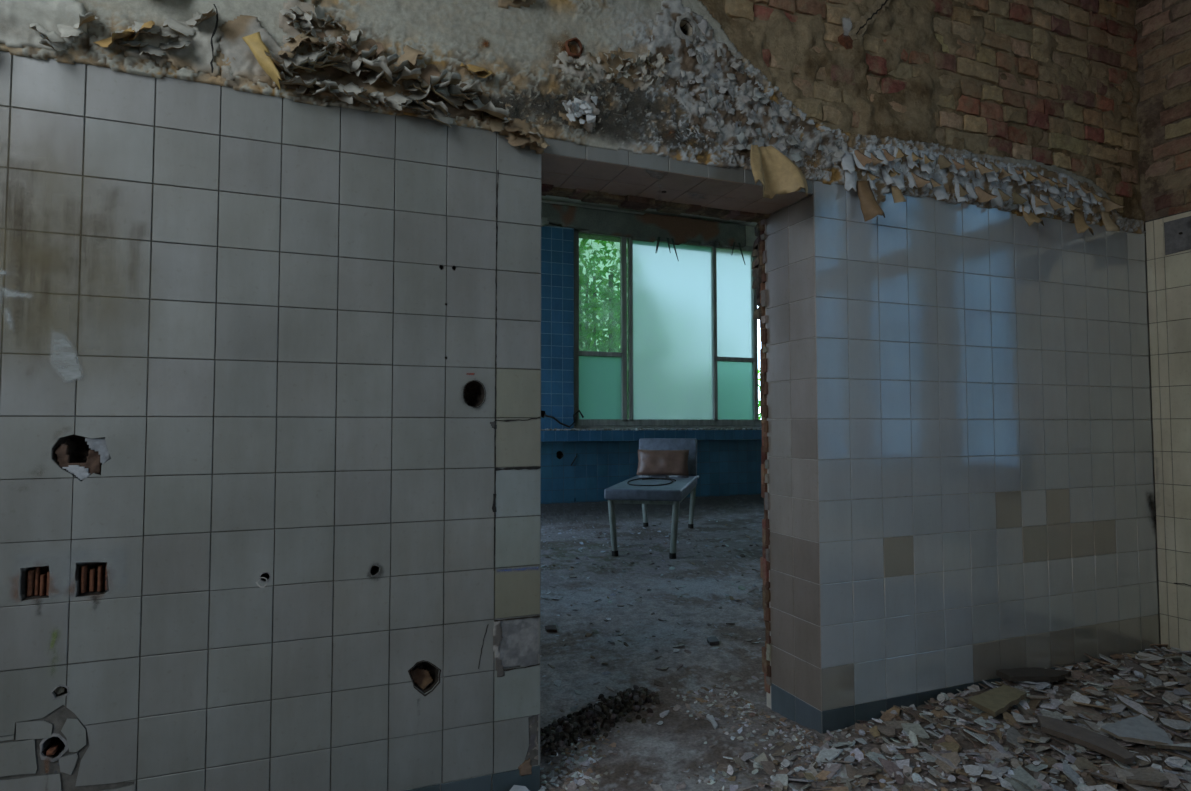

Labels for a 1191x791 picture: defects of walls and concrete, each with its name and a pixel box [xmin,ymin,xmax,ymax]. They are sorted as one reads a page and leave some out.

peeling [0,0,550,155]
spalling [552,0,1191,255]
spalling [52,434,111,481]
spalling [542,184,771,694]
spalling [408,660,441,696]
peeling [493,615,540,677]
spalling [0,718,87,791]